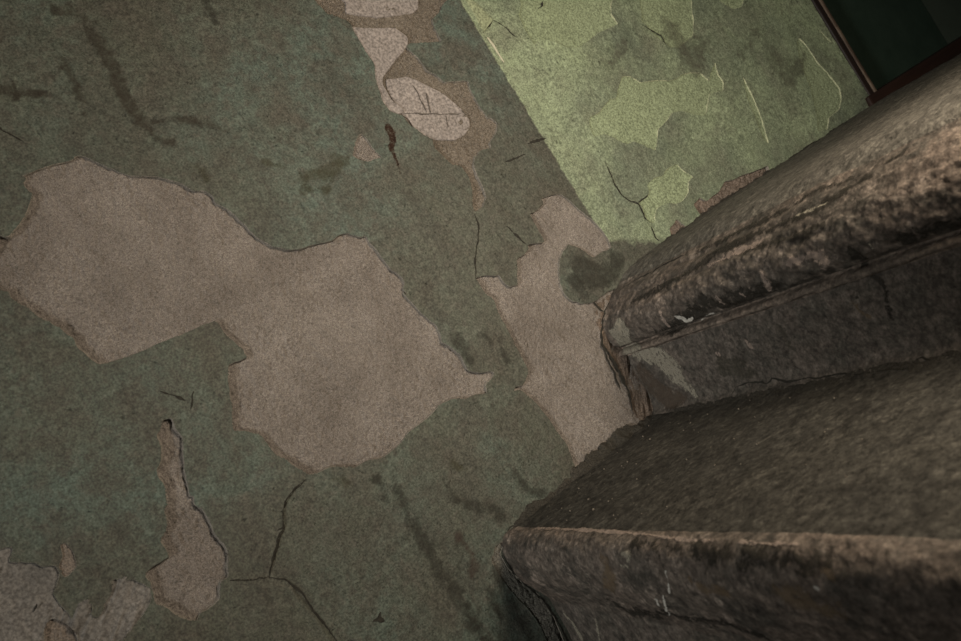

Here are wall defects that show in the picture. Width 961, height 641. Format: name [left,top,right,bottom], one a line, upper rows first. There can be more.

peeling [465,0,504,62]
peeling [518,0,618,49]
peeling [639,0,694,48]
spalling [314,0,498,212]
peeling [589,62,724,151]
peeling [742,77,769,143]
peeling [797,37,842,132]
peeling [639,164,769,223]
spalling [0,155,495,476]
spalling [475,193,653,467]
spalling [0,417,230,641]
crack [230,479,337,641]